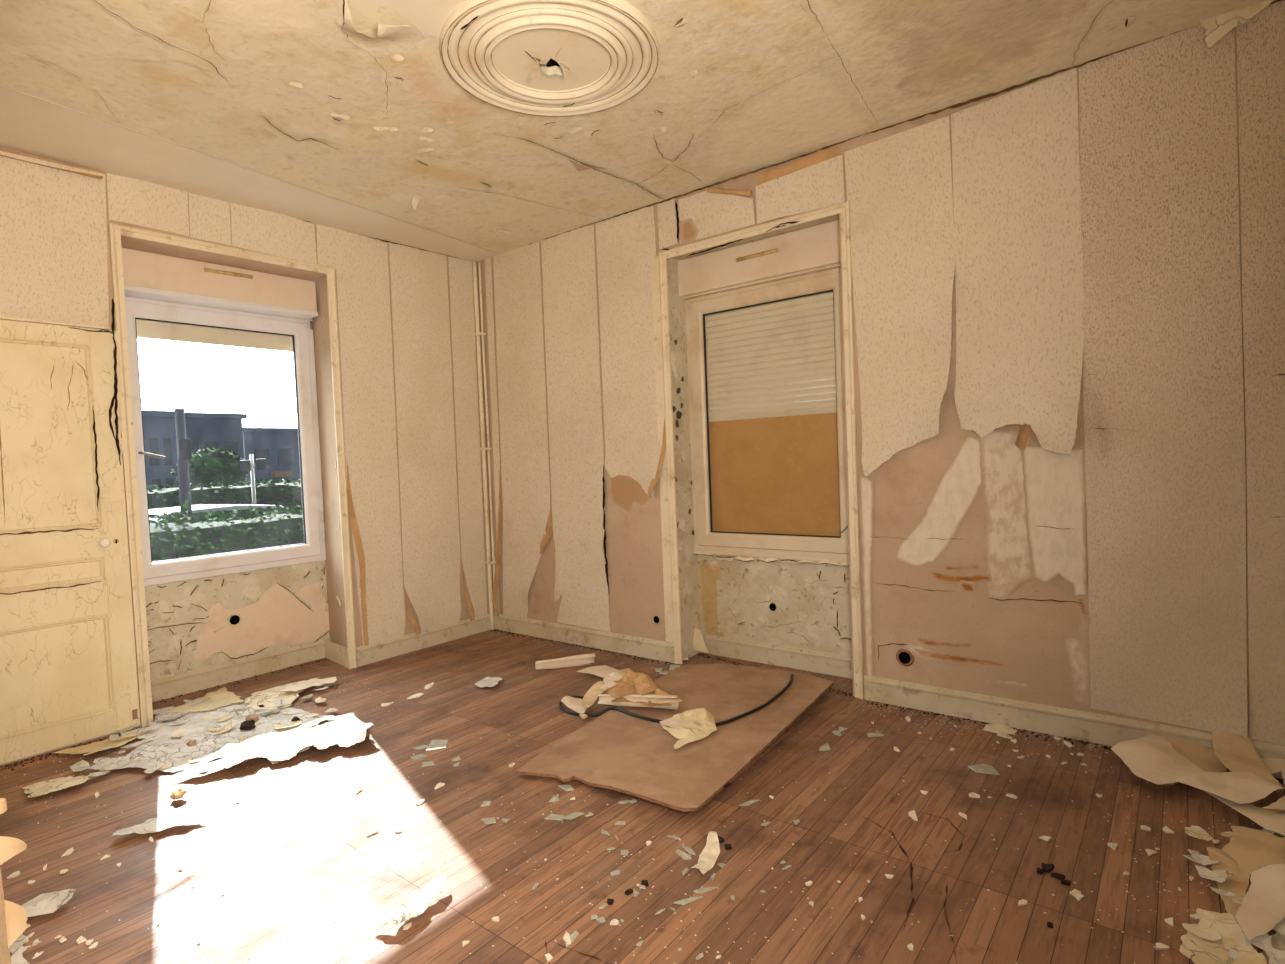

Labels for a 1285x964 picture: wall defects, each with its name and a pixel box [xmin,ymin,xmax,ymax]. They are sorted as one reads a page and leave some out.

crack [89,0,227,80]
crack [313,0,348,38]
peeling [342,0,466,83]
crack [260,114,338,150]
crack [494,0,879,257]
crack [0,299,124,535]
peeling [146,565,341,680]
peeling [678,539,852,645]